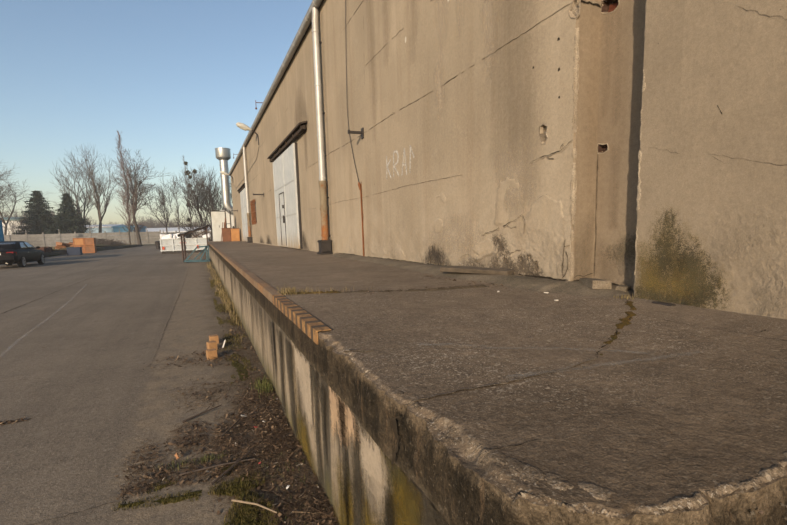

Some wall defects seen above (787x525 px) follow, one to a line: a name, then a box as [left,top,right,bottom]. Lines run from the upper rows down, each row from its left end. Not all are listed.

spalling [601,0,620,15]
crack [309,0,601,167]
spalling [539,123,548,145]
water stain [461,234,543,276]
crack [481,208,525,254]
crack [518,156,598,281]
water stain [218,259,448,525]
crack [404,283,787,406]